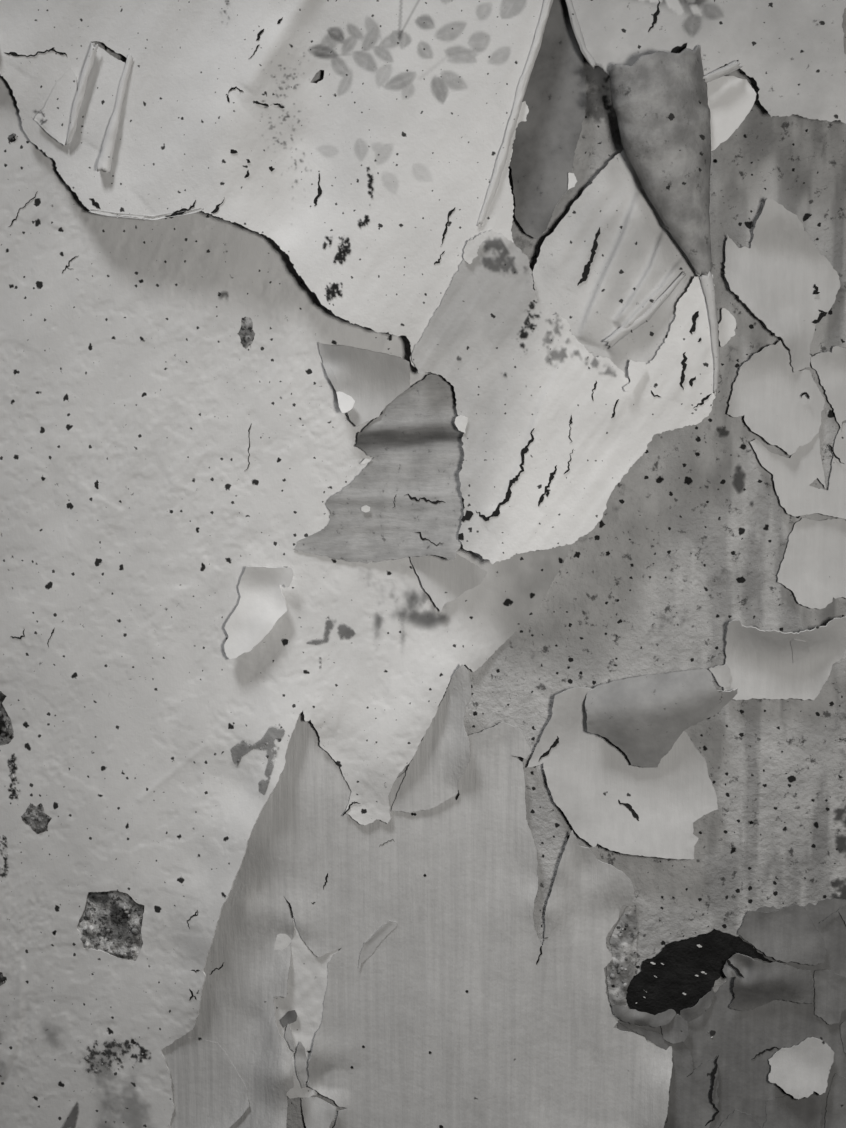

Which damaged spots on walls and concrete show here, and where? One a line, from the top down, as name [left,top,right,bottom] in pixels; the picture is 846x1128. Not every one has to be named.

peeling [718,308,736,347]
peeling [724,198,846,609]
peeling [0,75,719,1128]
peeling [709,616,846,700]
peeling [723,904,846,1025]
peeling [768,1037,846,1128]